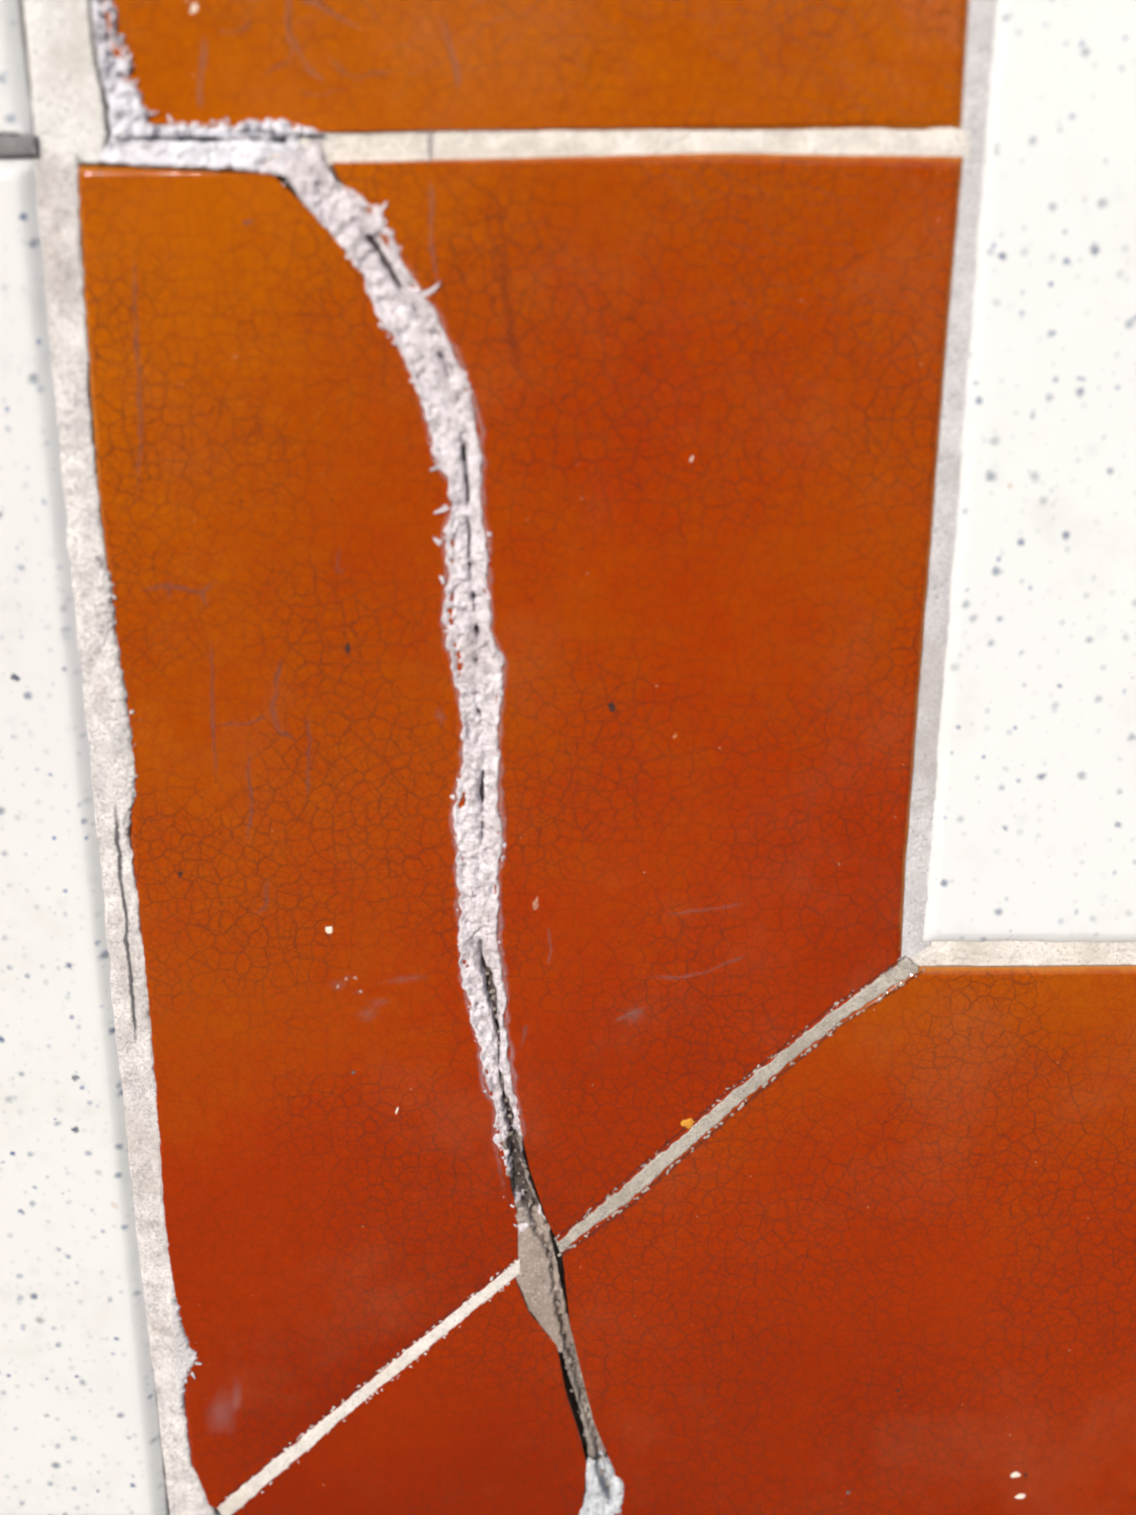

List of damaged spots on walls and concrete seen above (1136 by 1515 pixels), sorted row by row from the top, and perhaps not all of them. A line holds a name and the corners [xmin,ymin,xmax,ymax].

crack [87,0,610,1491]